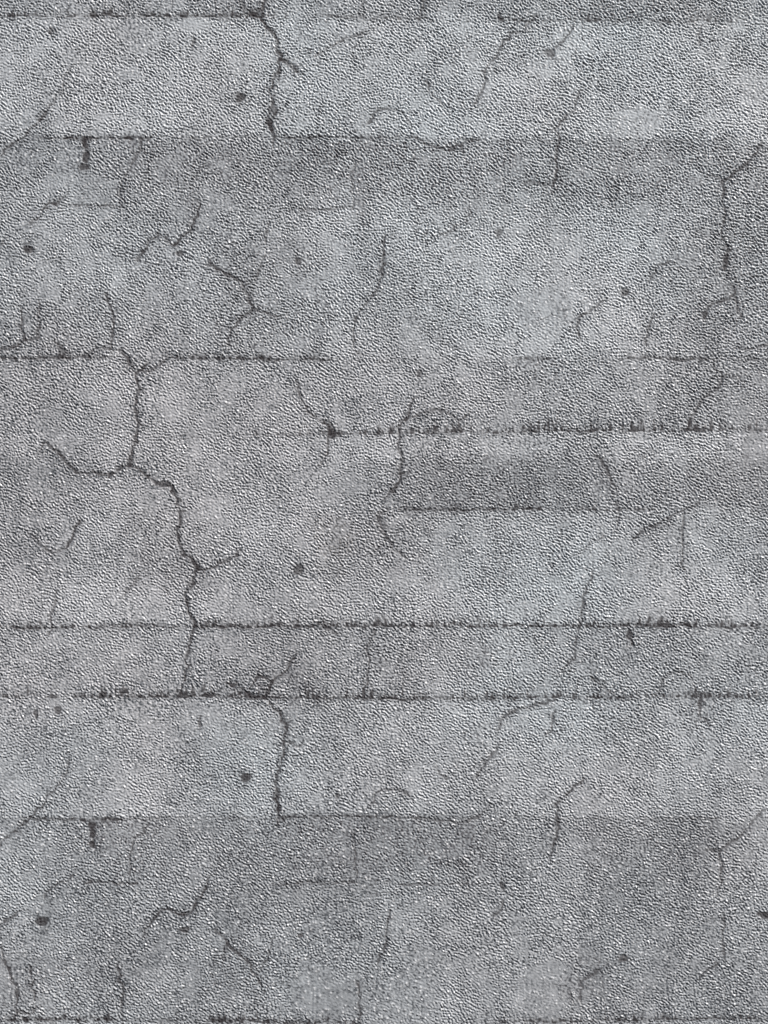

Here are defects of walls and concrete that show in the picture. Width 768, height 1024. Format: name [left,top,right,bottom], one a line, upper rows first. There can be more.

crack [238,0,372,148]
crack [416,0,428,24]
crack [133,198,202,265]
crack [205,220,282,350]
crack [685,139,768,433]
crack [0,291,242,701]
crack [372,395,471,560]
crack [224,652,306,831]
crack [270,450,701,888]
crack [353,878,507,1023]